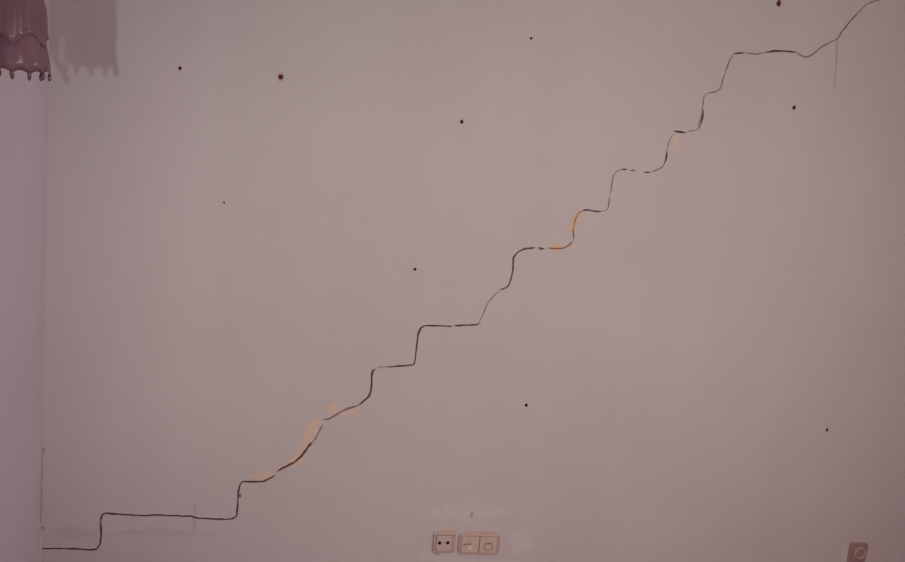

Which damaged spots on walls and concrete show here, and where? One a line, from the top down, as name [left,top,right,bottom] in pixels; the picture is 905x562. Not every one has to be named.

crack [644,0,880,174]
spalling [246,402,361,480]
crack [42,168,636,551]